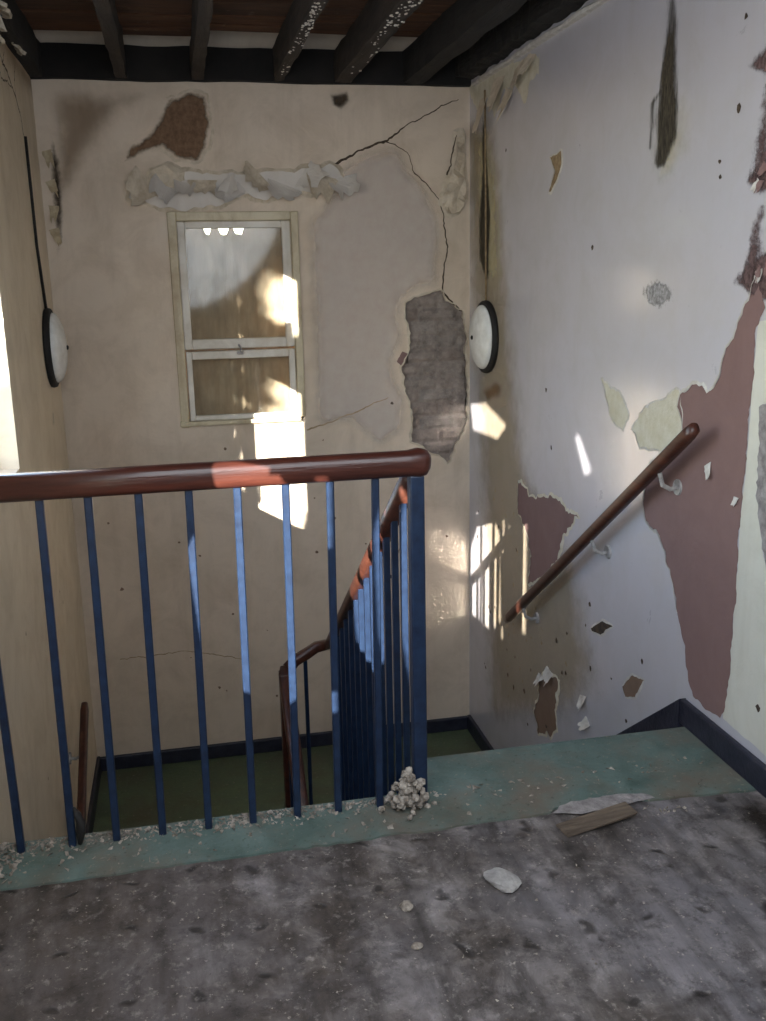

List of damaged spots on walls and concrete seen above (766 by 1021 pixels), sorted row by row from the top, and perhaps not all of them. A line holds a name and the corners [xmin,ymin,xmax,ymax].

peeling [123,88,360,213]
crack [335,99,462,311]
flaking render [397,287,470,465]
peeling [516,479,580,587]
peeling [601,275,766,756]
peeling [507,666,567,740]
peeling [576,695,590,731]